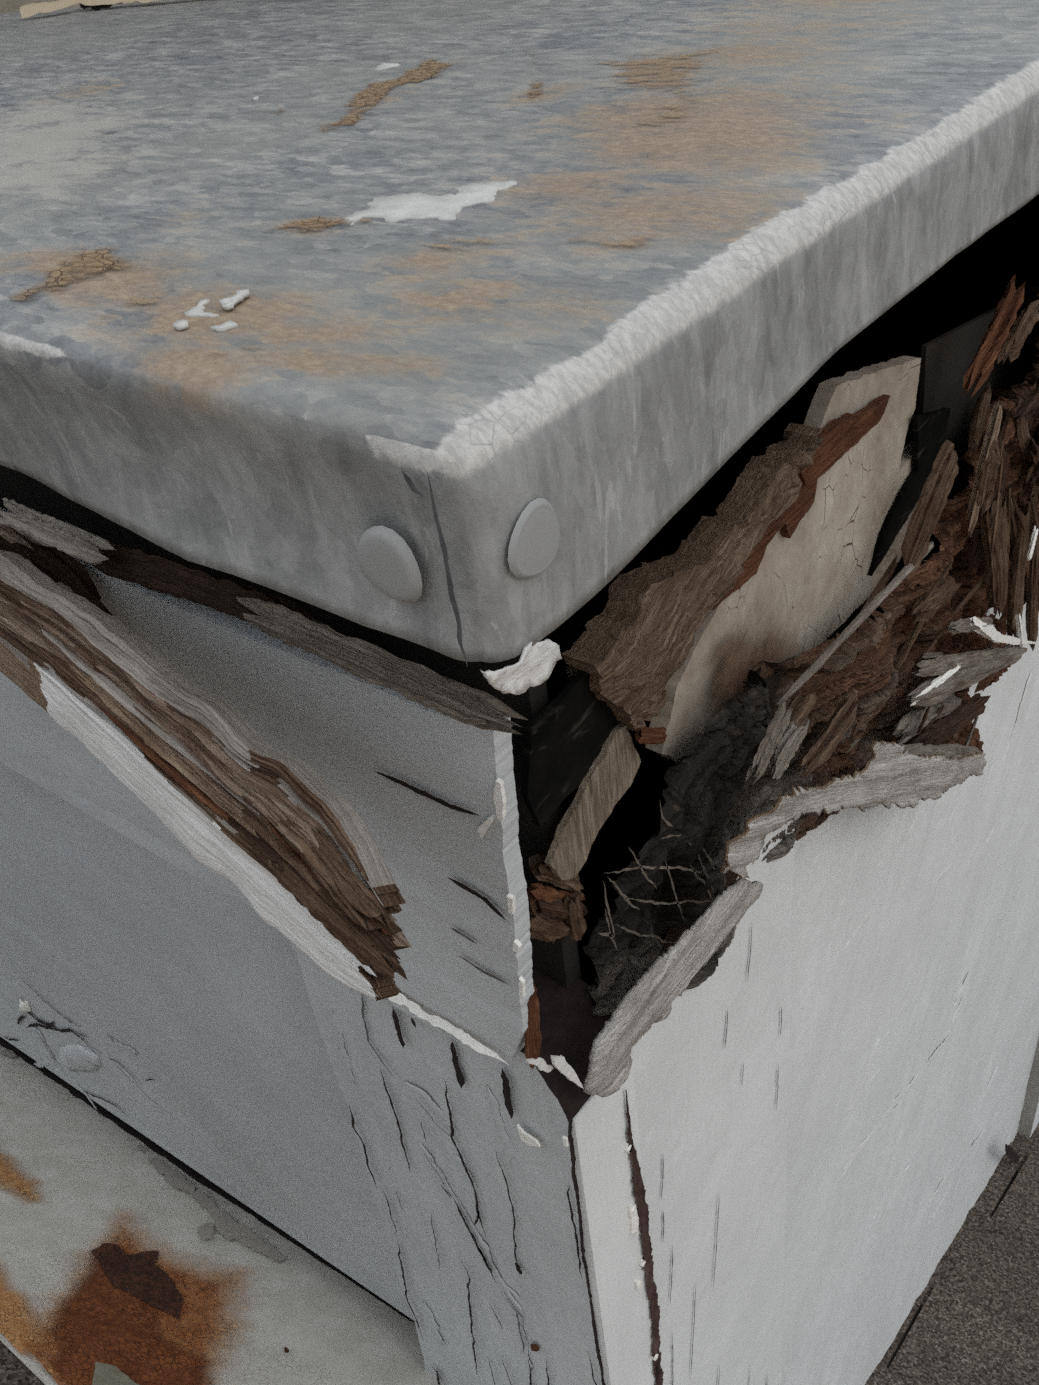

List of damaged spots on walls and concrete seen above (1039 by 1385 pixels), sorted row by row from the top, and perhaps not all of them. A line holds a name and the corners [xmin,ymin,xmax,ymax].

peeling [980,624,1036,645]
peeling [477,778,506,838]
peeling [506,893,516,915]
peeling [512,938,522,953]
peeling [526,740,987,1098]
peeling [518,975,526,1000]
peeling [387,993,509,1065]
rust [0,1153,38,1201]
crack [0,979,549,1385]
crack [567,1182,582,1277]
crack [625,1090,664,1385]
rust [0,1225,237,1385]